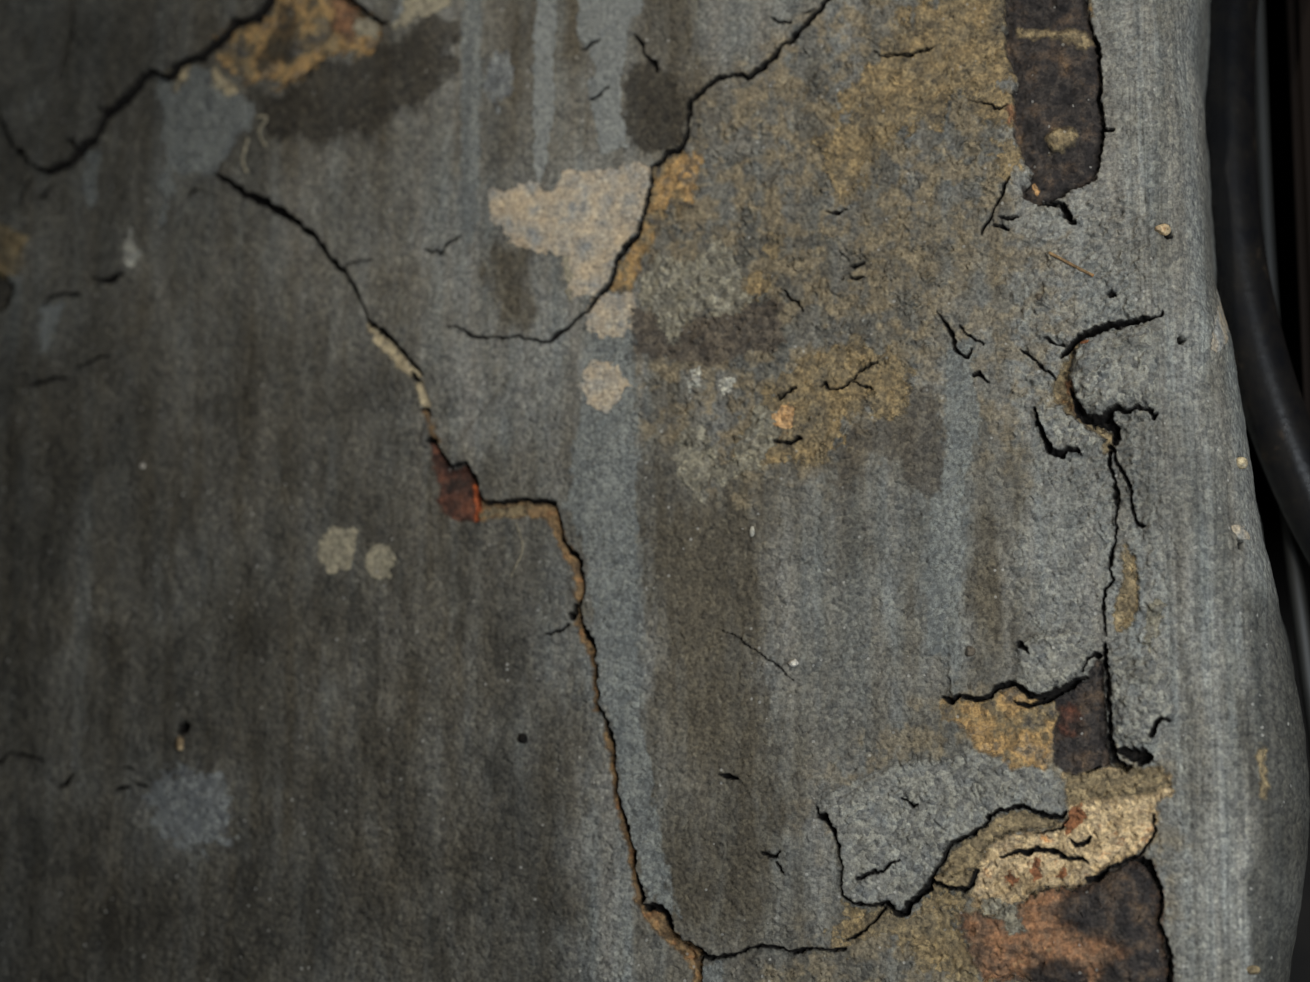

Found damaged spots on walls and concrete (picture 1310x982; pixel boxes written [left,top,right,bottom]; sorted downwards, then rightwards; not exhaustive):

spalling [0,224,29,312]
crack [4,0,276,207]
spalling [214,0,382,91]
crack [350,0,389,26]
crack [447,0,831,344]
spalling [1004,0,1103,206]
crack [1089,21,1115,171]
leakage [318,525,396,579]
leakage [389,0,786,916]
crack [187,173,1174,982]
spalling [817,660,1174,982]